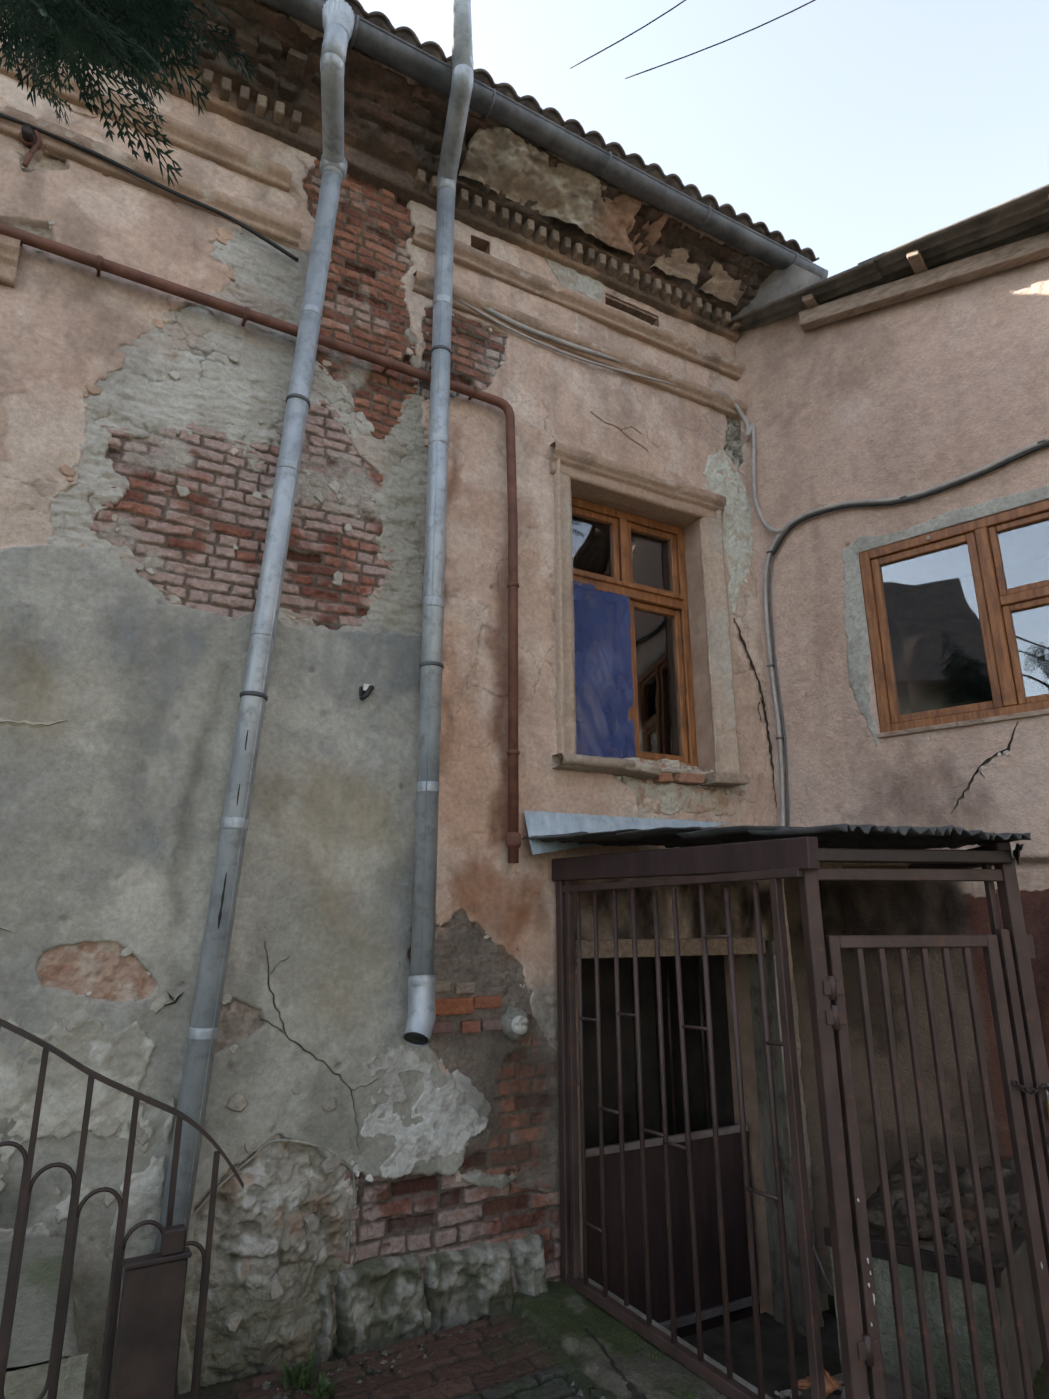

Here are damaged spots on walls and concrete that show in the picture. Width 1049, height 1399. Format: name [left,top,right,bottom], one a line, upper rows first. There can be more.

flaking render [46,224,310,618]
flaking render [301,157,322,224]
flaking render [278,173,433,636]
flaking render [449,313,508,404]
flaking render [545,258,604,302]
flaking render [702,414,753,614]
crack [0,718,67,728]
crack [733,618,777,808]
crack [951,722,1019,814]
flaking render [0,942,175,1329]
crack [258,941,382,1148]
flaking render [332,909,561,1317]